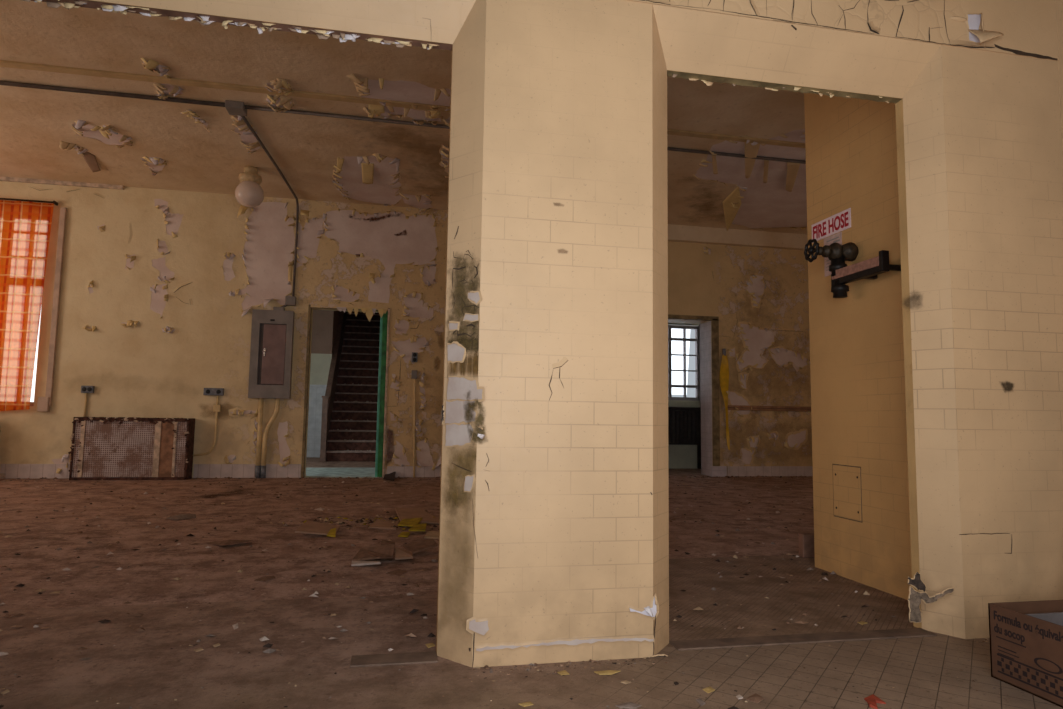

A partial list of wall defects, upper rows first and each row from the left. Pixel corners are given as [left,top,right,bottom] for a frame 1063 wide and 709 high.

peeling [23,0,453,51]
crack [642,0,1057,60]
peeling [59,119,169,175]
peeling [347,73,451,178]
peeling [691,127,807,231]
peeling [667,71,902,104]
peeling [228,199,441,392]
leakage [440,258,479,351]
peeling [436,290,485,466]
peeling [726,321,810,418]
leakage [448,400,485,508]
spalling [908,572,954,623]